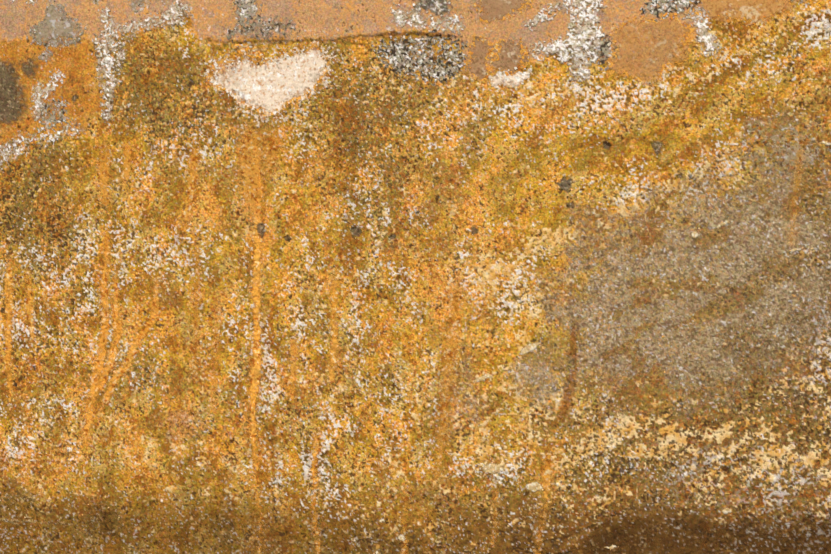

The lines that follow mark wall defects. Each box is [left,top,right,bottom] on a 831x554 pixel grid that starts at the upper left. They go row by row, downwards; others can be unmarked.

damp [0,59,86,170]
damp [92,0,191,125]
peeling [200,30,343,127]
damp [371,0,468,82]
damp [524,0,620,83]
rust [4,263,14,402]
rust [82,233,160,447]
rust [241,136,277,530]
rust [329,280,339,383]
rust [311,436,321,554]
rust [536,464,552,554]
damp [580,524,665,554]